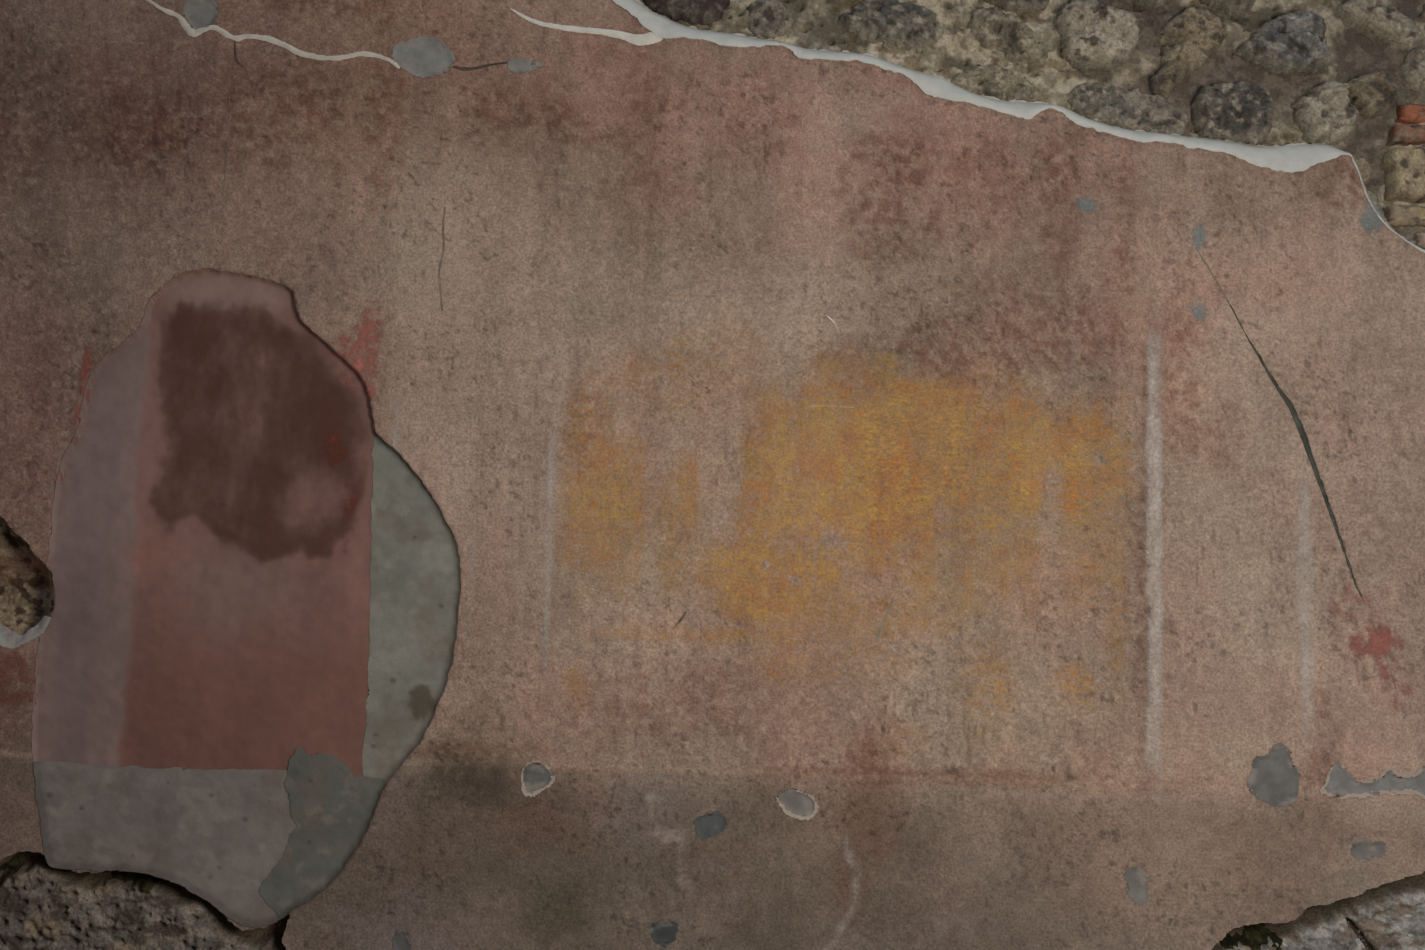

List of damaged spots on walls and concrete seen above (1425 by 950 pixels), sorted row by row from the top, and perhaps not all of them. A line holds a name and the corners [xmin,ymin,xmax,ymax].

crack [145,0,400,69]
crack [453,62,508,71]
spalling [640,0,1425,250]
water stain [158,305,383,559]
crack [1199,253,1399,696]
flaking render [0,268,461,950]
spalling [1320,761,1425,800]
spalling [1211,871,1425,950]